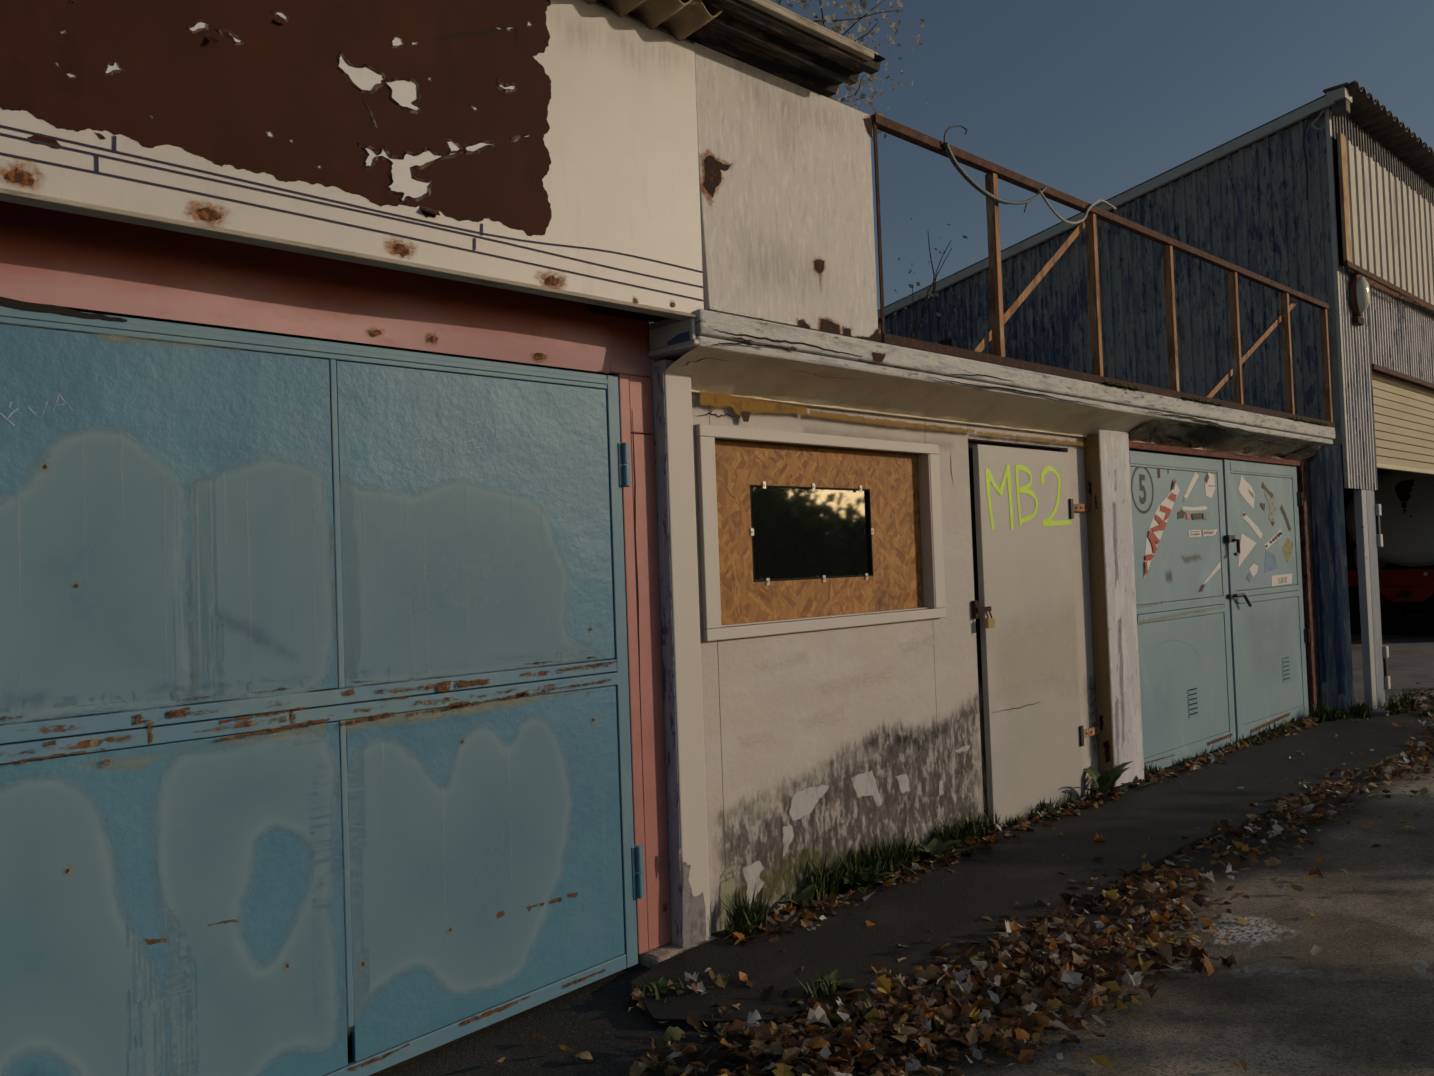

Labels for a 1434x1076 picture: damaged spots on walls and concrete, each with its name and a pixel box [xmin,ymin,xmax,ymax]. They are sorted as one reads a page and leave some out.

peeling [186,19,248,45]
peeling [390,35,418,48]
peeling [335,50,431,129]
peeling [28,133,61,149]
corrosion [0,164,42,188]
peeling [356,132,531,216]
corrosion [187,201,224,225]
corrosion [387,240,416,258]
corrosion [0,657,618,766]
flaking render [851,770,882,807]
flaking render [782,785,829,857]
damp [723,707,979,910]